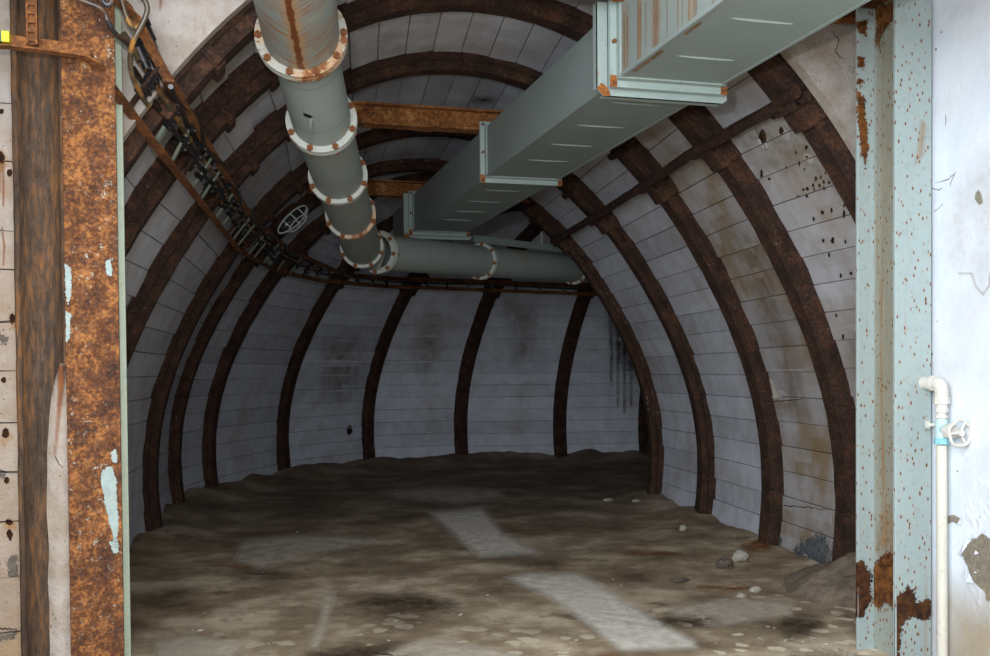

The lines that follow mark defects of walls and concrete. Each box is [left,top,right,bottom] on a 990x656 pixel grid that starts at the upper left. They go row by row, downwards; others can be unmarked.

corrosion [834,0,893,48]
corrosion [856,56,870,169]
corrosion [856,530,931,656]
flaking render [958,534,990,601]